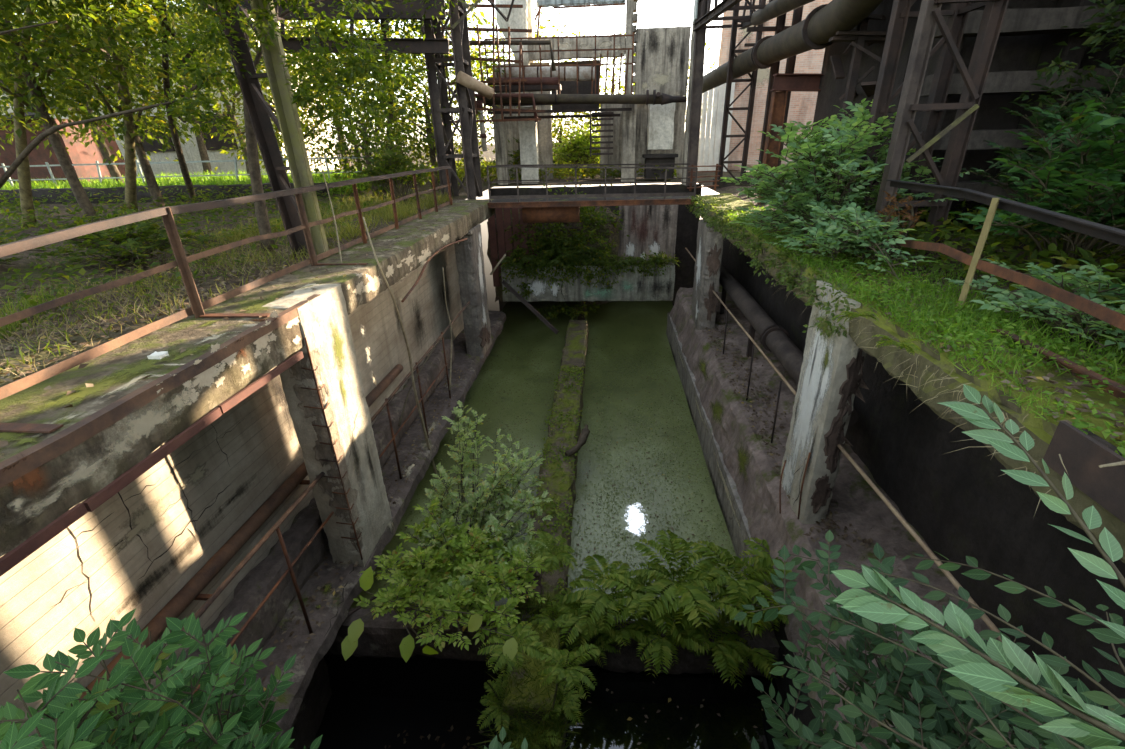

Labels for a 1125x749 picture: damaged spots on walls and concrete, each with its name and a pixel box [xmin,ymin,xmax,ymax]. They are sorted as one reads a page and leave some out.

spalling [346,233,487,325]
spalling [360,325,377,386]
spalling [143,310,363,564]
crack [55,418,245,620]
damp [126,522,212,605]